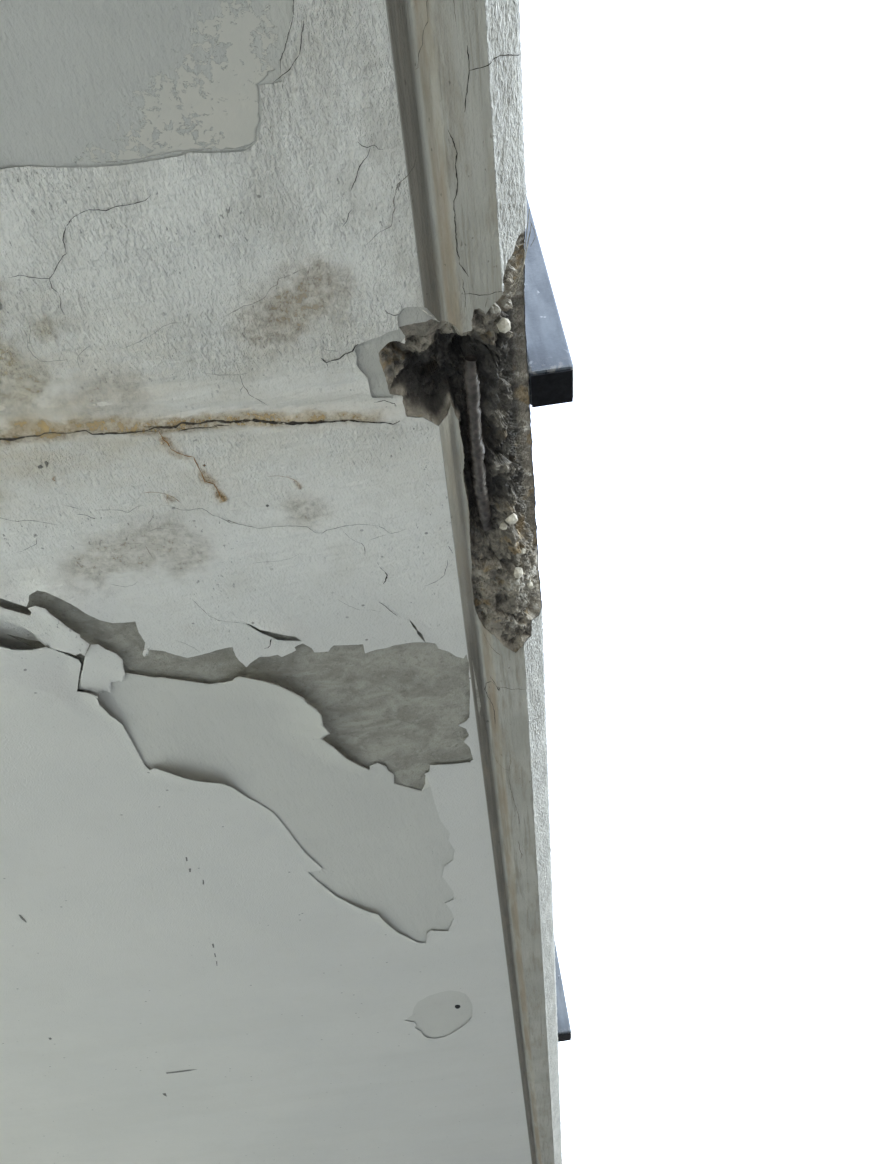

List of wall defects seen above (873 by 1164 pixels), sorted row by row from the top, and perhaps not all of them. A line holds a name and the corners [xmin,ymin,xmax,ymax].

peeling [0,0,318,191]
crack [274,0,304,82]
crack [465,46,520,108]
crack [9,195,151,312]
crack [448,131,502,307]
damp [268,264,323,340]
crack [321,344,358,367]
damp [2,417,211,443]
crack [0,373,400,441]
spalling [341,232,541,653]
peeling [0,558,482,945]
peeling [399,990,478,1041]